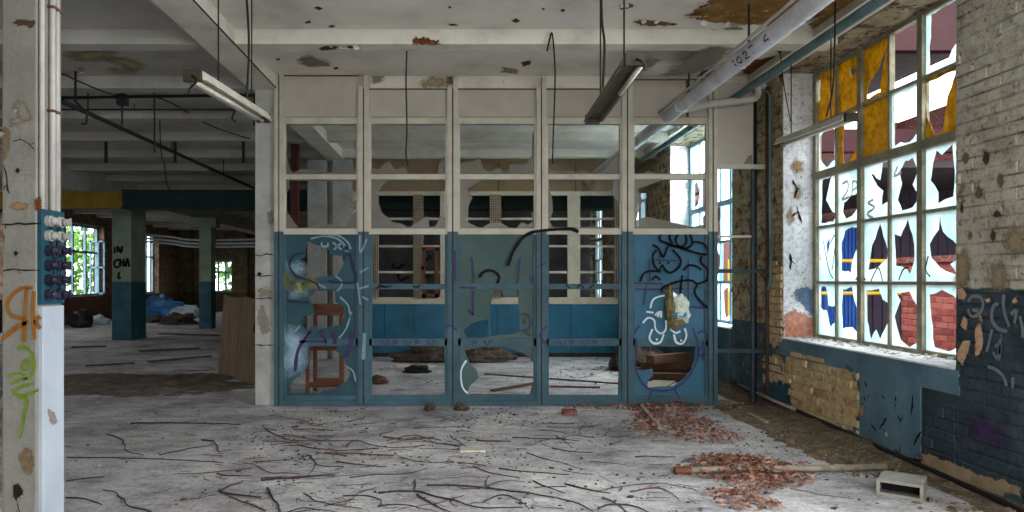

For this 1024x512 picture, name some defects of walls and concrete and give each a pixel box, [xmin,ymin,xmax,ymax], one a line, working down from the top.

spalling [13,19,36,28]
peeling [619,0,799,30]
peeling [805,0,854,29]
spalling [412,37,442,46]
water stain [68,51,142,73]
flaking render [758,261,993,435]
spalling [13,447,34,500]